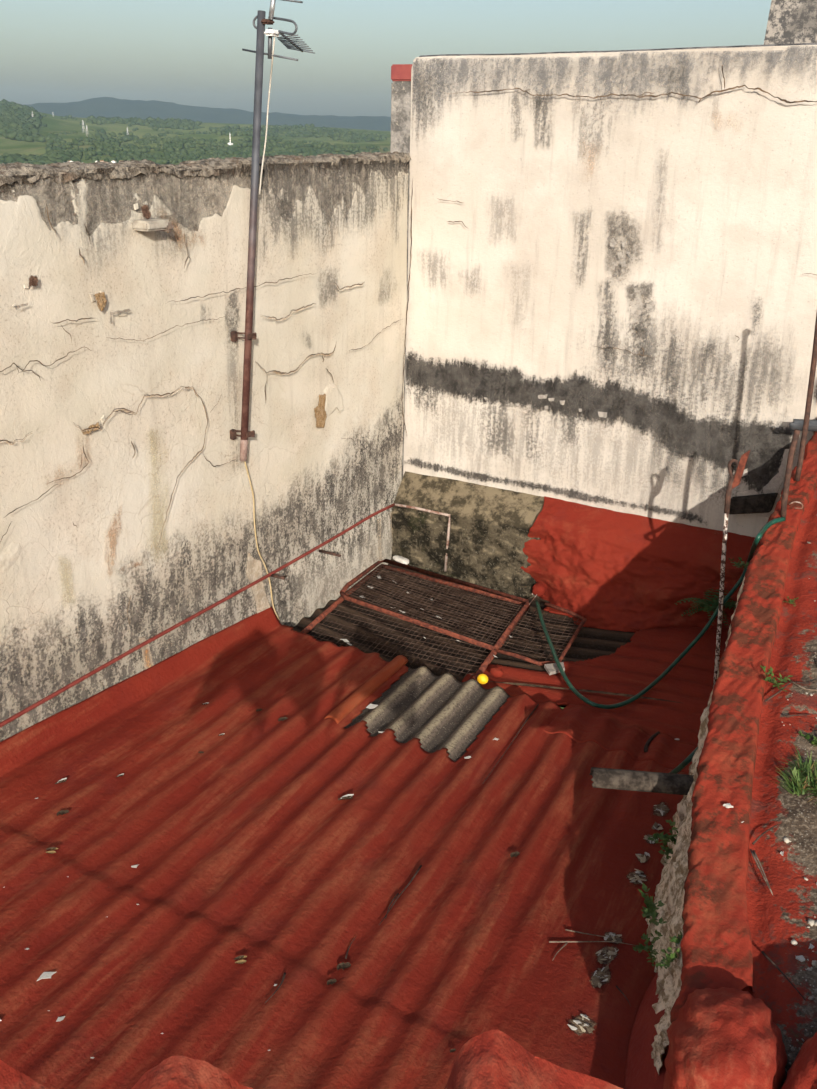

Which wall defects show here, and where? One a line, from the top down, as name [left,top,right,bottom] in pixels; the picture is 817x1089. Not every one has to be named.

damp [412,46,817,145]
crack [447,66,817,103]
crack [44,203,91,264]
peeling [0,151,411,235]
crack [0,273,364,381]
spalling [314,383,344,428]
crack [255,182,413,433]
damp [406,212,793,493]
crack [0,386,234,553]
damp [0,402,702,742]